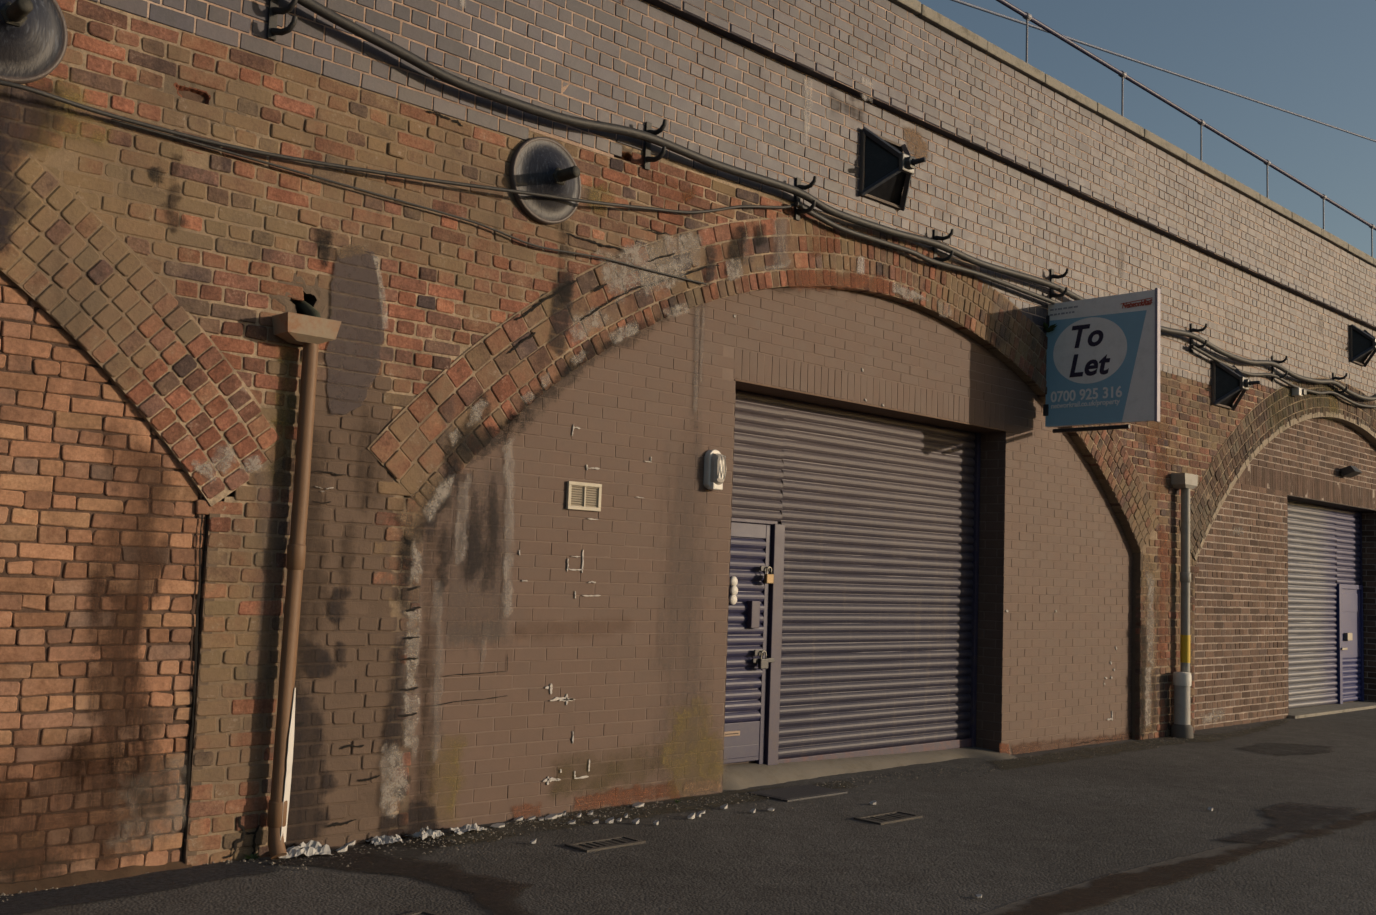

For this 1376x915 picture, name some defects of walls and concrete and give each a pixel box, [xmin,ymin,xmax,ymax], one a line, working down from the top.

water stain [0,87,53,250]
water stain [550,222,600,353]
water stain [598,234,717,299]
water stain [269,434,533,915]
water stain [0,740,150,884]